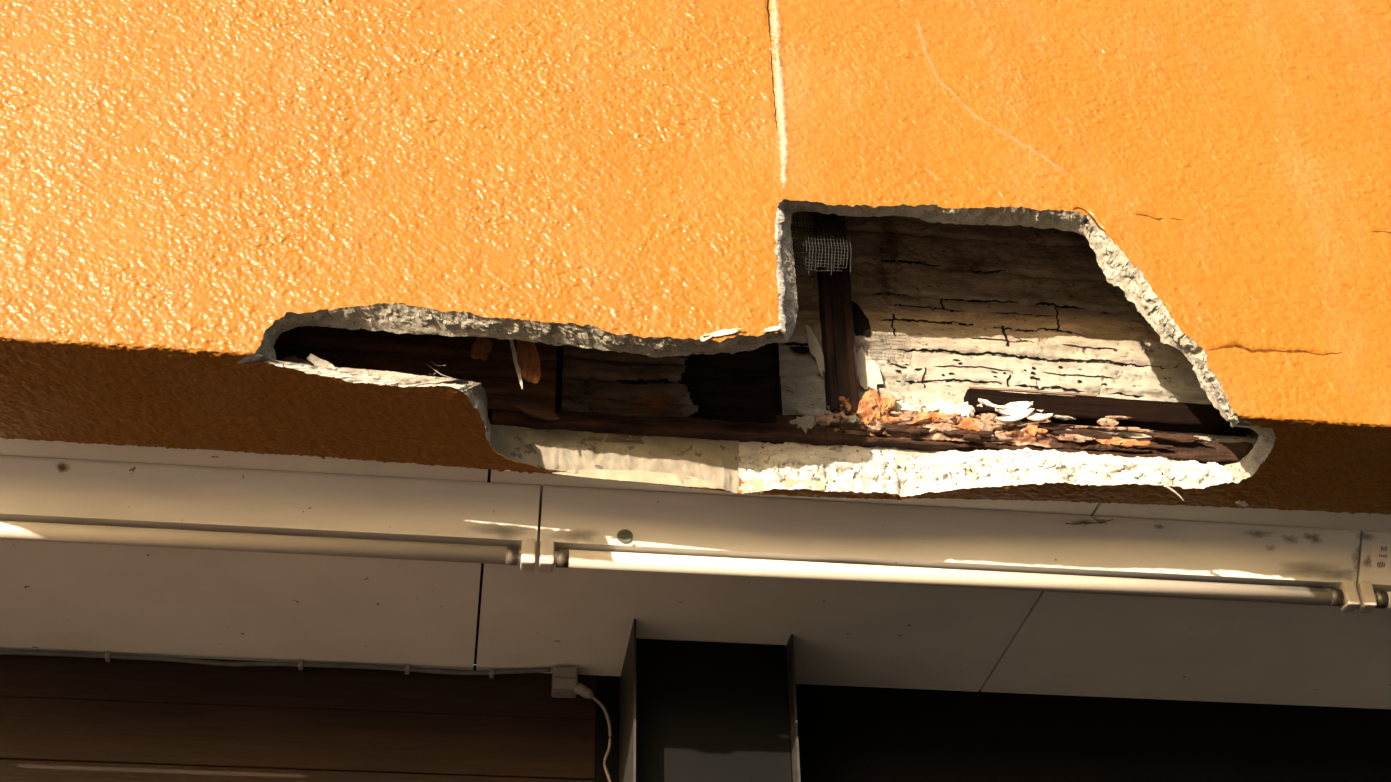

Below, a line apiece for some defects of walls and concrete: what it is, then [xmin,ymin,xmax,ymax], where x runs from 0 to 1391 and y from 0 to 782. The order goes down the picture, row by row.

spalling [237,199,1276,501]
crack [782,340,808,348]
crack [872,260,1165,398]
crack [1208,344,1343,355]